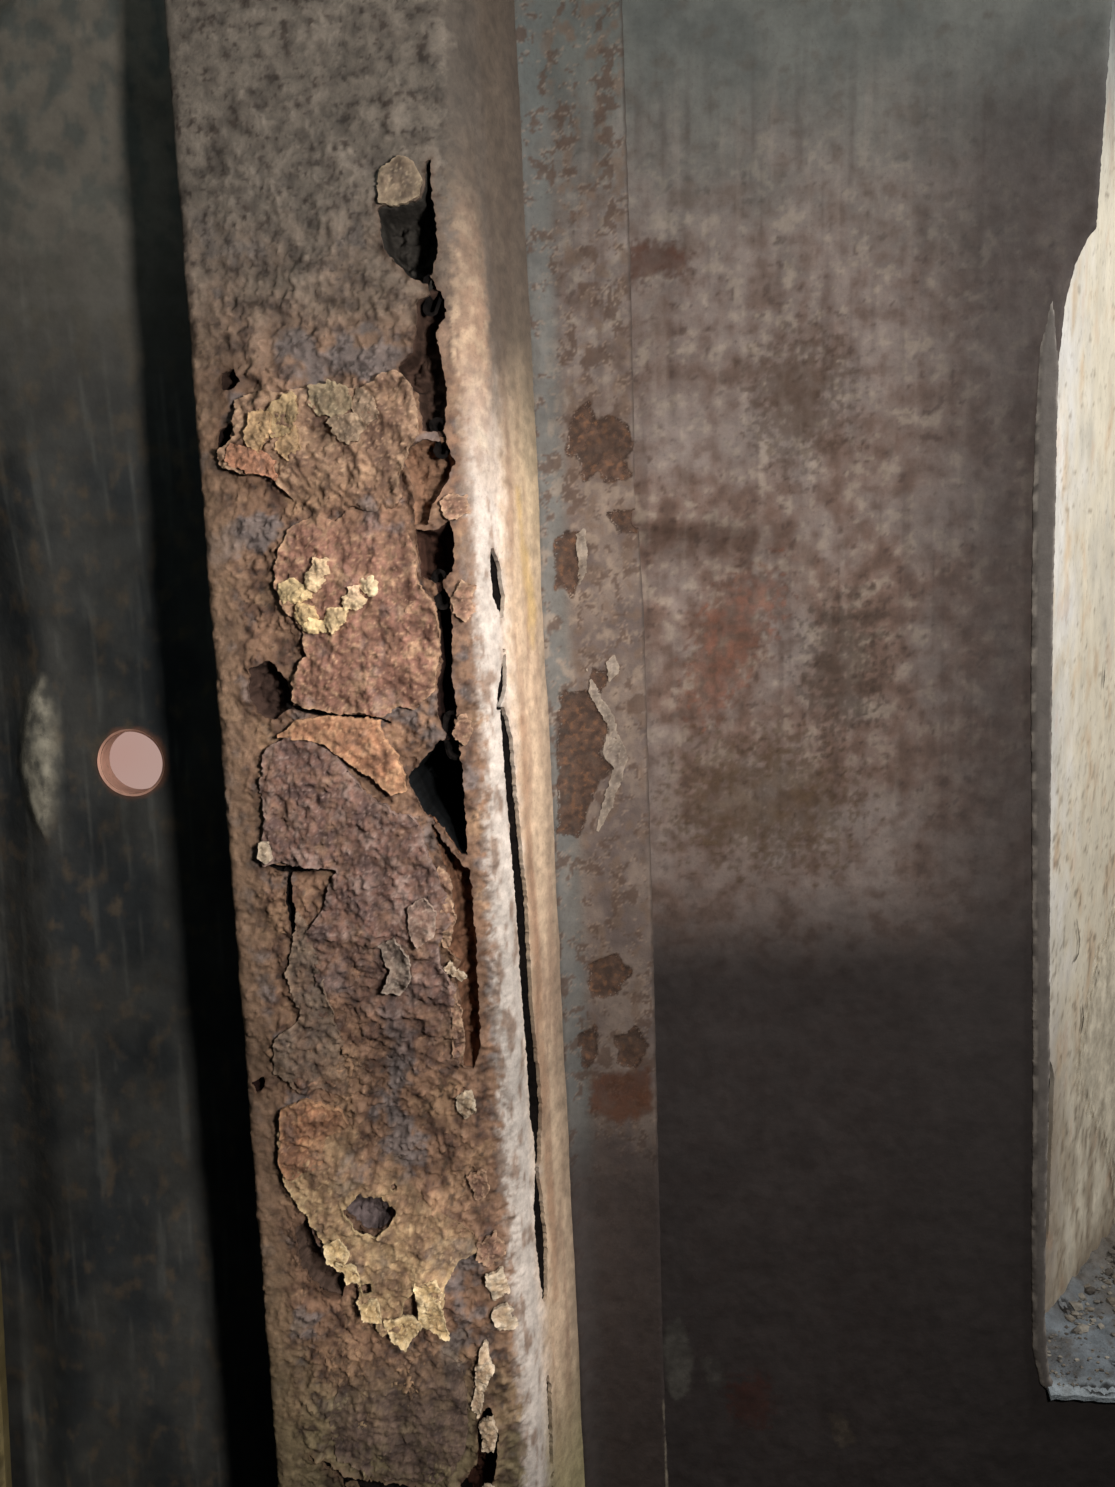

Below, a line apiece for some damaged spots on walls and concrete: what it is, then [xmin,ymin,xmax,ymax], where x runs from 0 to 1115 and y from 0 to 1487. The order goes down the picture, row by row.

corrosion [376,155,423,207]
peeling [224,379,379,481]
crack [431,569,451,610]
crack [490,553,501,613]
corrosion [277,715,408,796]
crack [442,710,461,760]
corrosion [452,713,473,745]
peeling [556,655,628,838]
peeling [257,841,273,864]
crack [496,666,544,1299]
spalling [295,1219,450,1352]
corrosion [471,1230,519,1453]